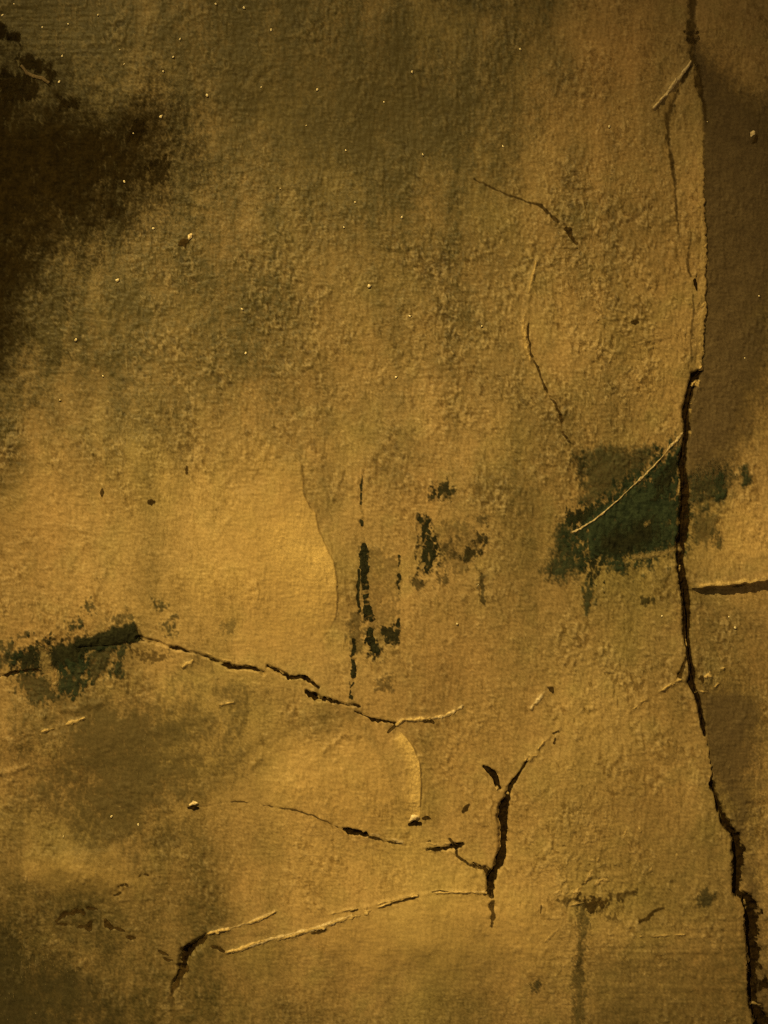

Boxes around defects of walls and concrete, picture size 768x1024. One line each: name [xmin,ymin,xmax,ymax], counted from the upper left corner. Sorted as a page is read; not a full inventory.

crack [666,0,706,217]
crack [475,179,578,245]
leakage [547,43,768,615]
leakage [6,602,141,701]
crack [169,646,463,733]
leakage [349,543,400,699]
leakage [415,513,438,574]
leakage [428,482,455,500]
leakage [463,534,487,562]
crack [676,370,706,736]
crack [158,730,559,993]
crack [709,780,768,1024]